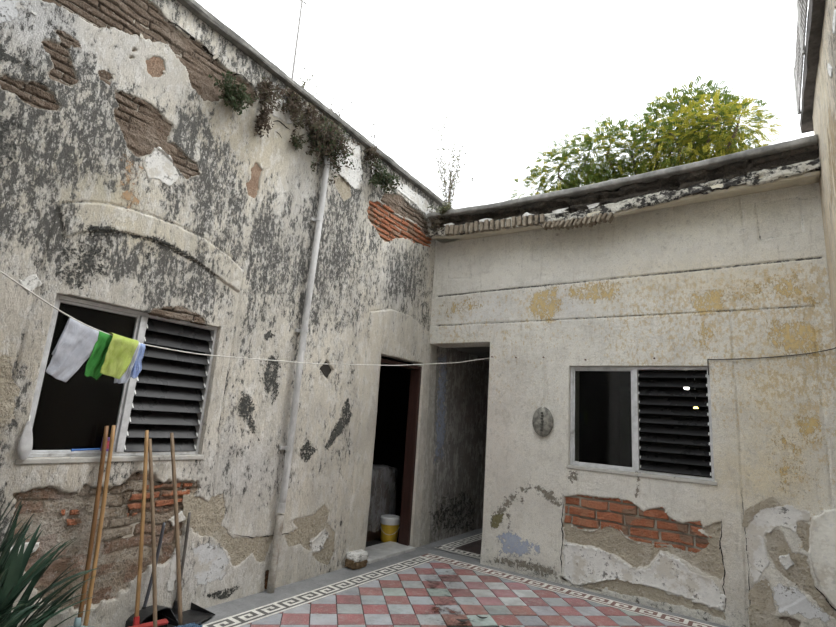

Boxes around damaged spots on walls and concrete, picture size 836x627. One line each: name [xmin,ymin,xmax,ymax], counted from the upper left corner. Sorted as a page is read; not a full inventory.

water stain [0,49,32,70]
peeling [42,0,292,124]
peeling [98,69,202,187]
water stain [55,222,205,289]
flaking render [367,179,436,247]
water stain [236,391,260,441]
water stain [258,354,286,405]
water stain [300,398,352,462]
flaking render [6,472,273,613]
peeling [562,495,726,620]
crack [718,519,726,607]
flaking render [742,496,836,627]